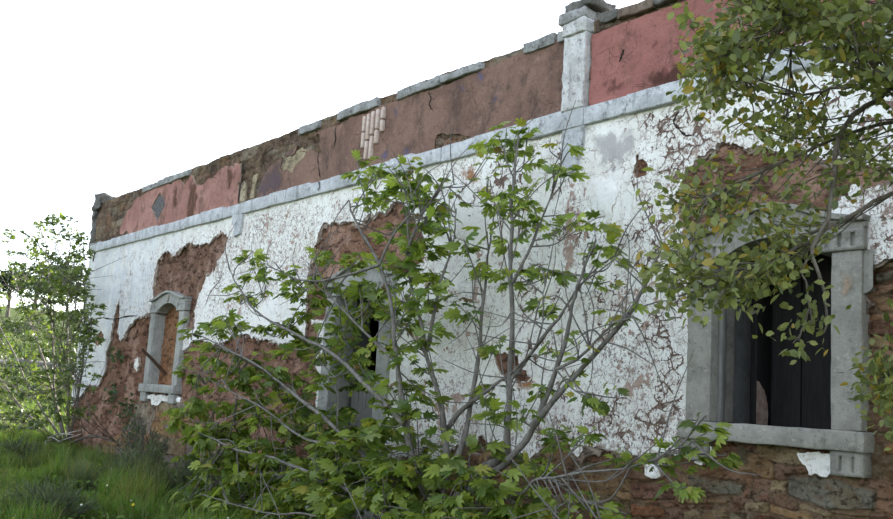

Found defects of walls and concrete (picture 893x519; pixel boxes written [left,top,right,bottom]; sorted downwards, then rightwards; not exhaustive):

spalling [688,142,730,173]
spalling [150,232,230,298]
peeling [250,209,298,245]
spalling [304,192,400,277]
crack [461,97,720,451]
spalling [72,291,152,408]
peeling [623,365,653,398]
spalling [529,431,621,464]